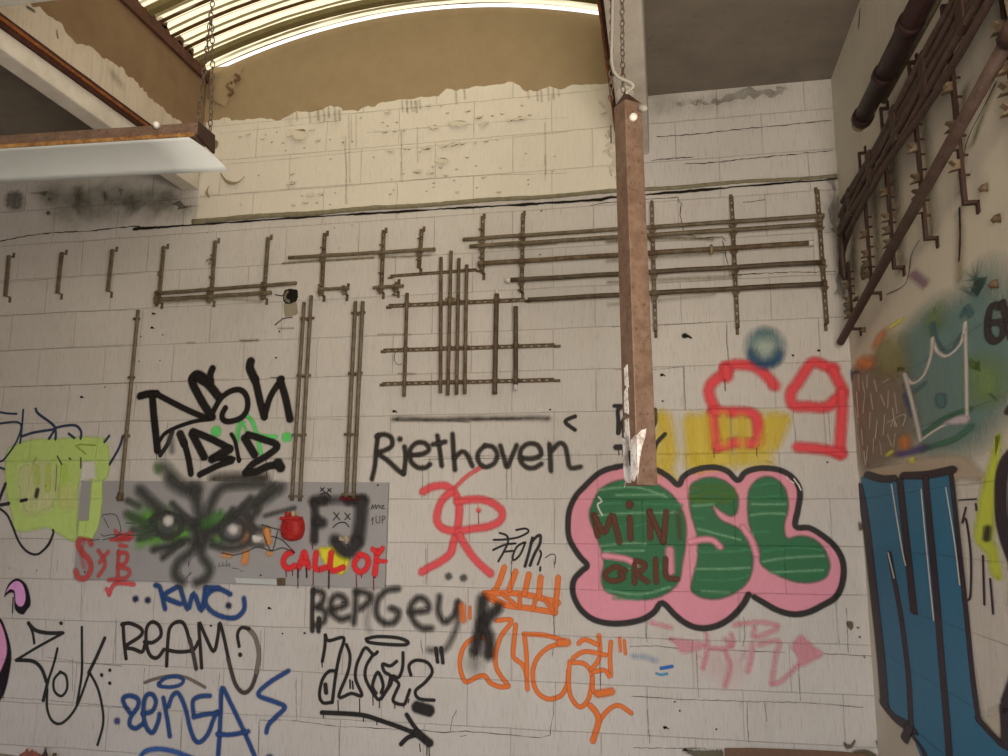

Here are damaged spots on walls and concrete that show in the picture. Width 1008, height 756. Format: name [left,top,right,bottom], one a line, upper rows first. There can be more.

peeling [0,4,182,125]
peeling [197,82,616,219]
crack [651,120,834,164]
crack [0,196,617,242]
crack [645,178,838,275]